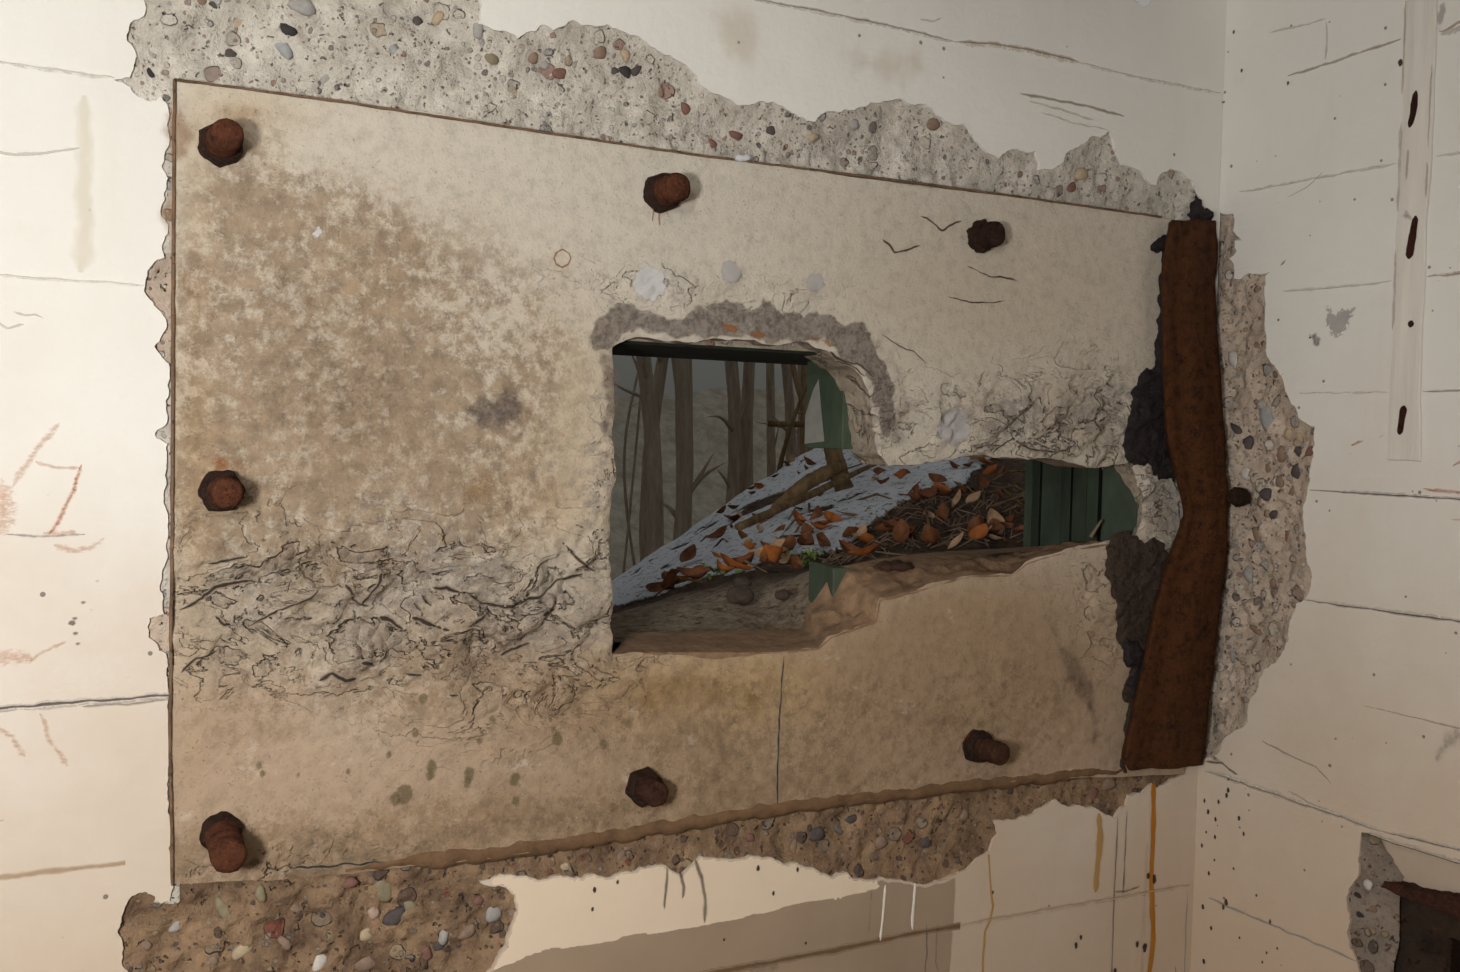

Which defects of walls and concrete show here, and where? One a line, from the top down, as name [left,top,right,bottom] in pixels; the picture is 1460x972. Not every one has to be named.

spalling [116,0,1197,708]
spalling [1203,212,1315,761]
crack [0,542,595,712]
spalling [118,774,1179,972]
rust [1148,784,1156,972]
spalling [1349,832,1460,972]